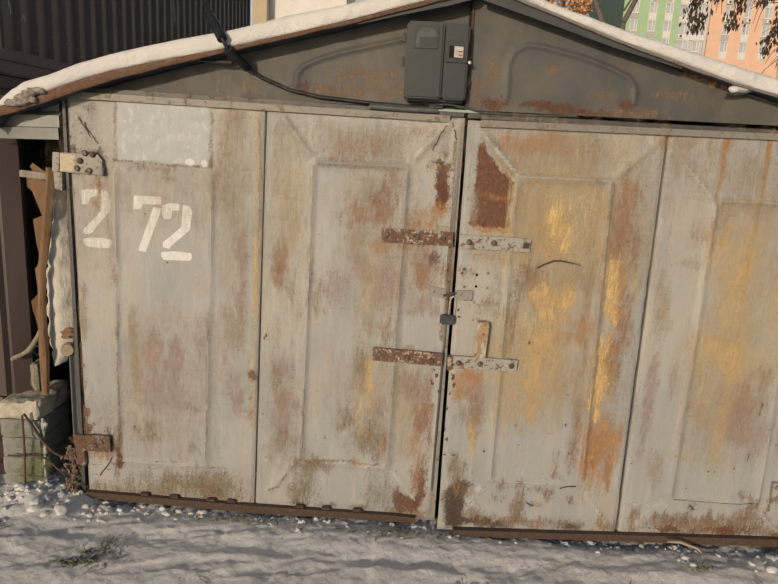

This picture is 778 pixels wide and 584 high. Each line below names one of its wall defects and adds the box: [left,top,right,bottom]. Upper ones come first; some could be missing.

corrosion [519,100,657,117]
corrosion [412,142,456,228]
corrosion [467,142,514,232]
corrosion [70,405,242,501]
corrosion [368,455,428,517]
corrosion [441,454,584,529]
corrosion [580,418,622,491]
corrosion [647,492,778,537]